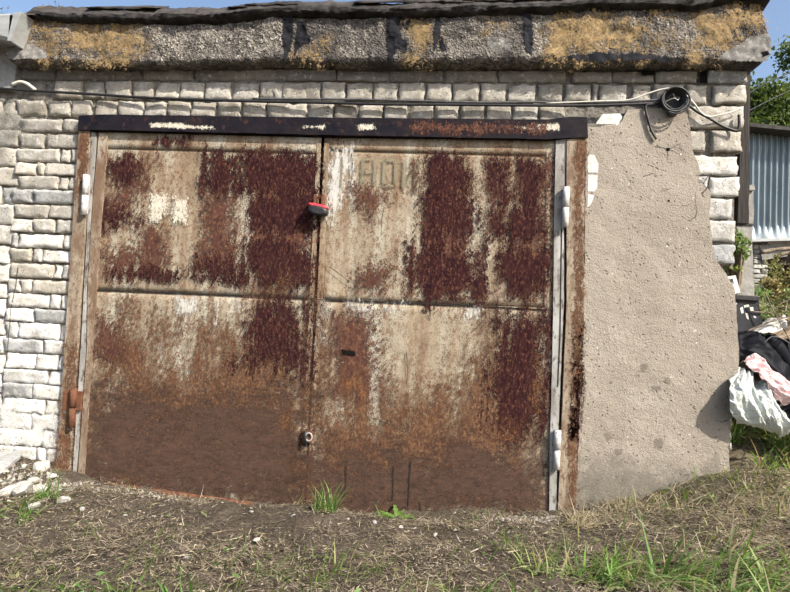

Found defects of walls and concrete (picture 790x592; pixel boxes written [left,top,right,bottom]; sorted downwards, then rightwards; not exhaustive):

leakage [293,20,312,56]
leakage [396,20,411,55]
rust [406,119,551,138]
flaking render [596,113,622,124]
flaking render [587,154,598,207]
rust [566,138,589,508]
rust [52,341,80,472]